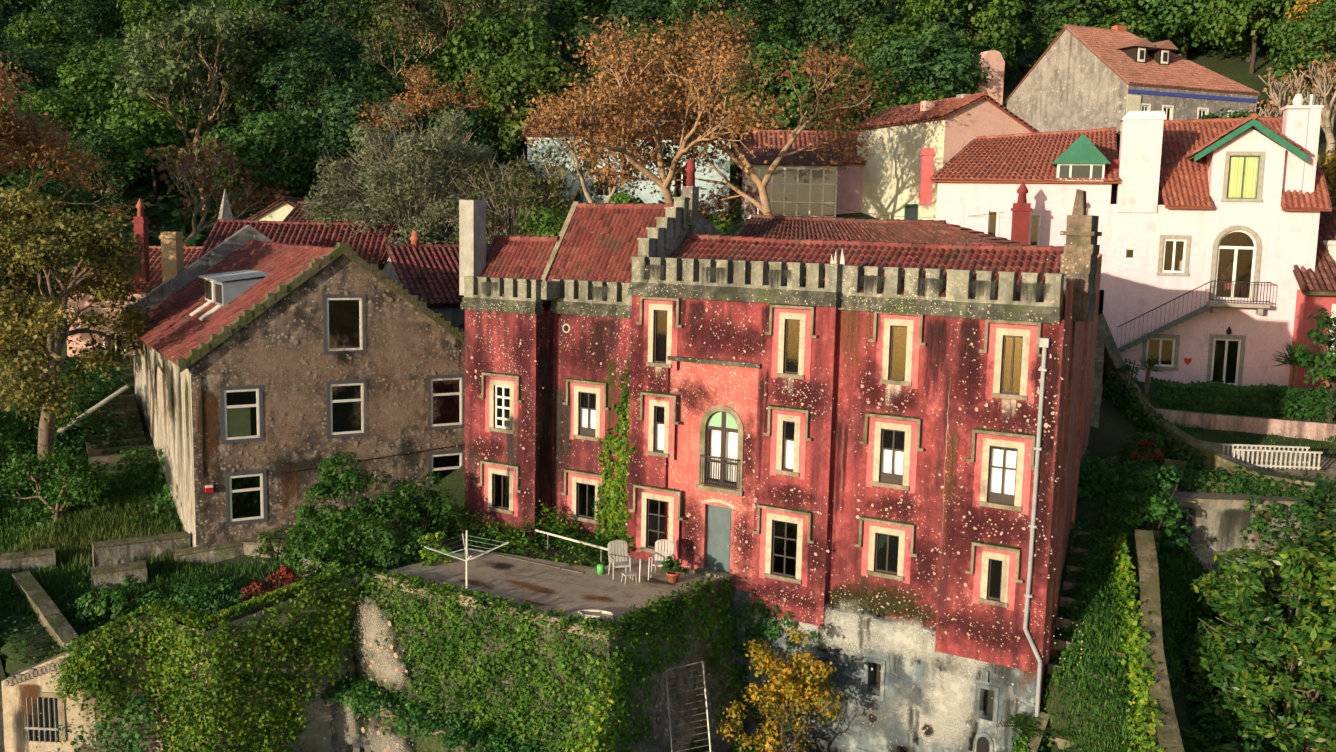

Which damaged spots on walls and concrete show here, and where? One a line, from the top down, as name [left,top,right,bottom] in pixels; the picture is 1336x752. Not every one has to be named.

damp [145,347,217,471]
peeling [559,298,1084,750]
damp [1179,508,1195,538]
damp [1218,509,1269,551]
damp [859,618,870,646]
damp [853,685,934,752]
damp [983,662,1035,752]